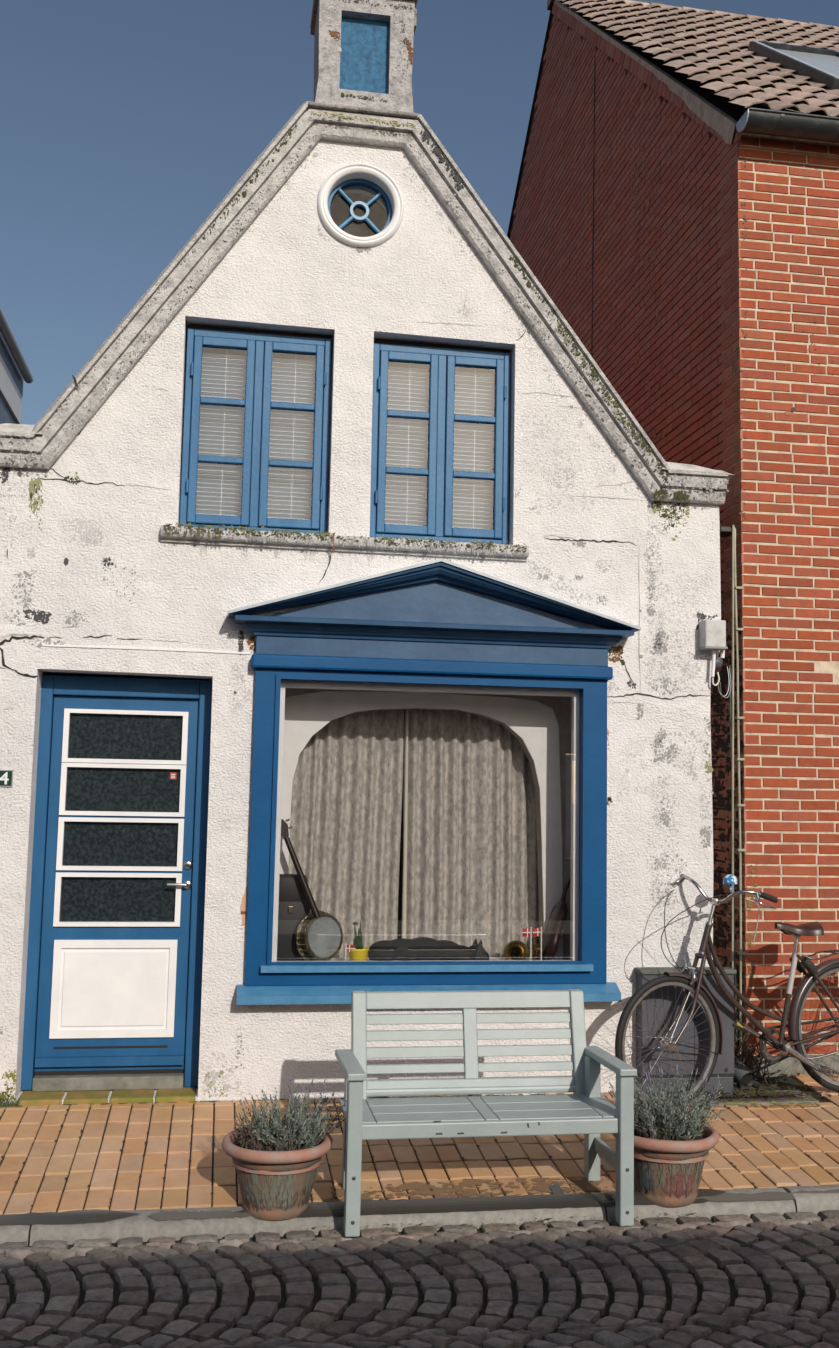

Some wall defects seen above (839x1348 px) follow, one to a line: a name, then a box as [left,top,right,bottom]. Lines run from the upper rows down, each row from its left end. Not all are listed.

water stain [403,117,729,720]
crack [0,626,182,678]
crack [546,535,710,704]
mould [614,717,714,967]